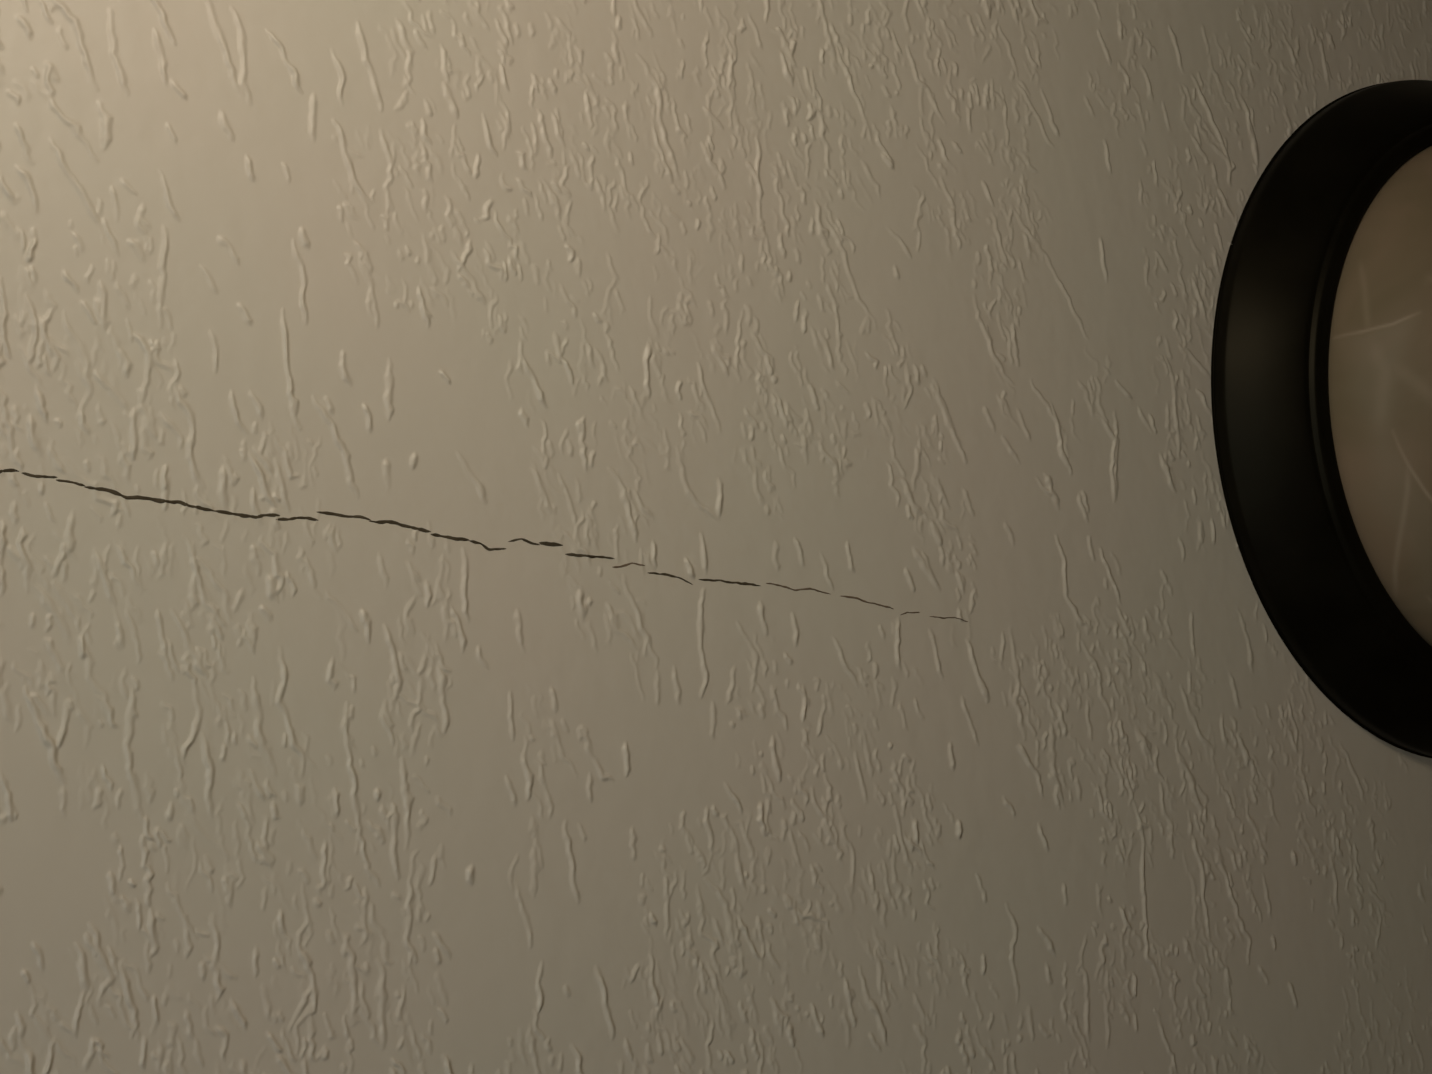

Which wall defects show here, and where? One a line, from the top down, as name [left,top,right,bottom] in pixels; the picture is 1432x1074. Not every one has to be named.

crack [0,469,968,622]